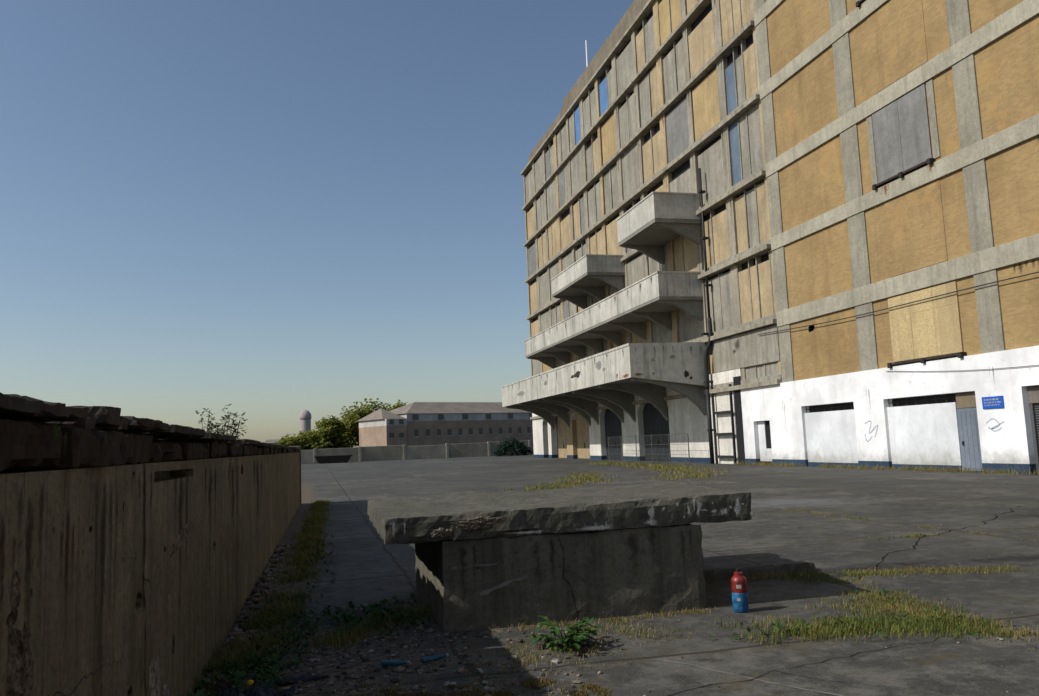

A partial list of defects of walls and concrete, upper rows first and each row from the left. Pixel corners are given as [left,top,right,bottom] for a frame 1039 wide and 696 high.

peeling [676,499,754,517]
crack [858,506,1028,580]